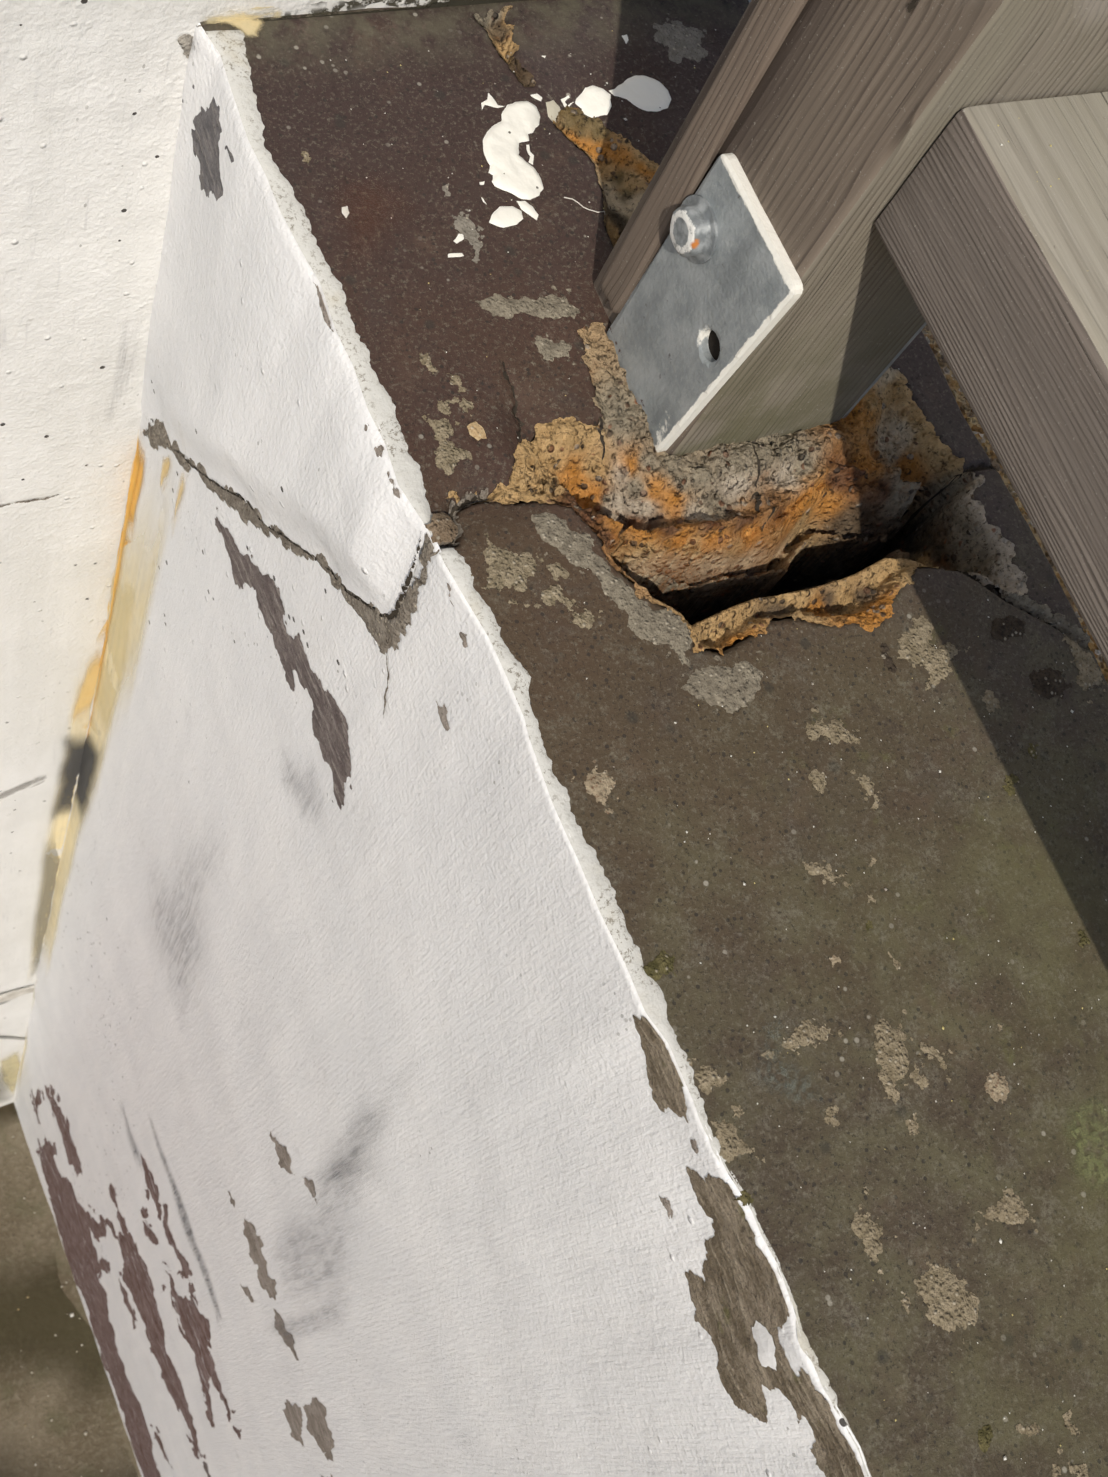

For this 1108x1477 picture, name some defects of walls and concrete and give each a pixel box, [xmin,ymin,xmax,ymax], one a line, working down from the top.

peeling [191,97,234,201]
peeling [364,424,400,498]
spalling [419,286,1106,714]
peeling [215,507,352,810]
peeling [873,1009,953,1135]
peeling [30,1085,241,1477]
peeling [228,1191,299,1361]
peeling [269,1131,318,1206]
peeling [633,1015,864,1477]
peeling [849,1187,898,1274]
peeling [901,1261,980,1344]
peeling [283,1397,334,1477]